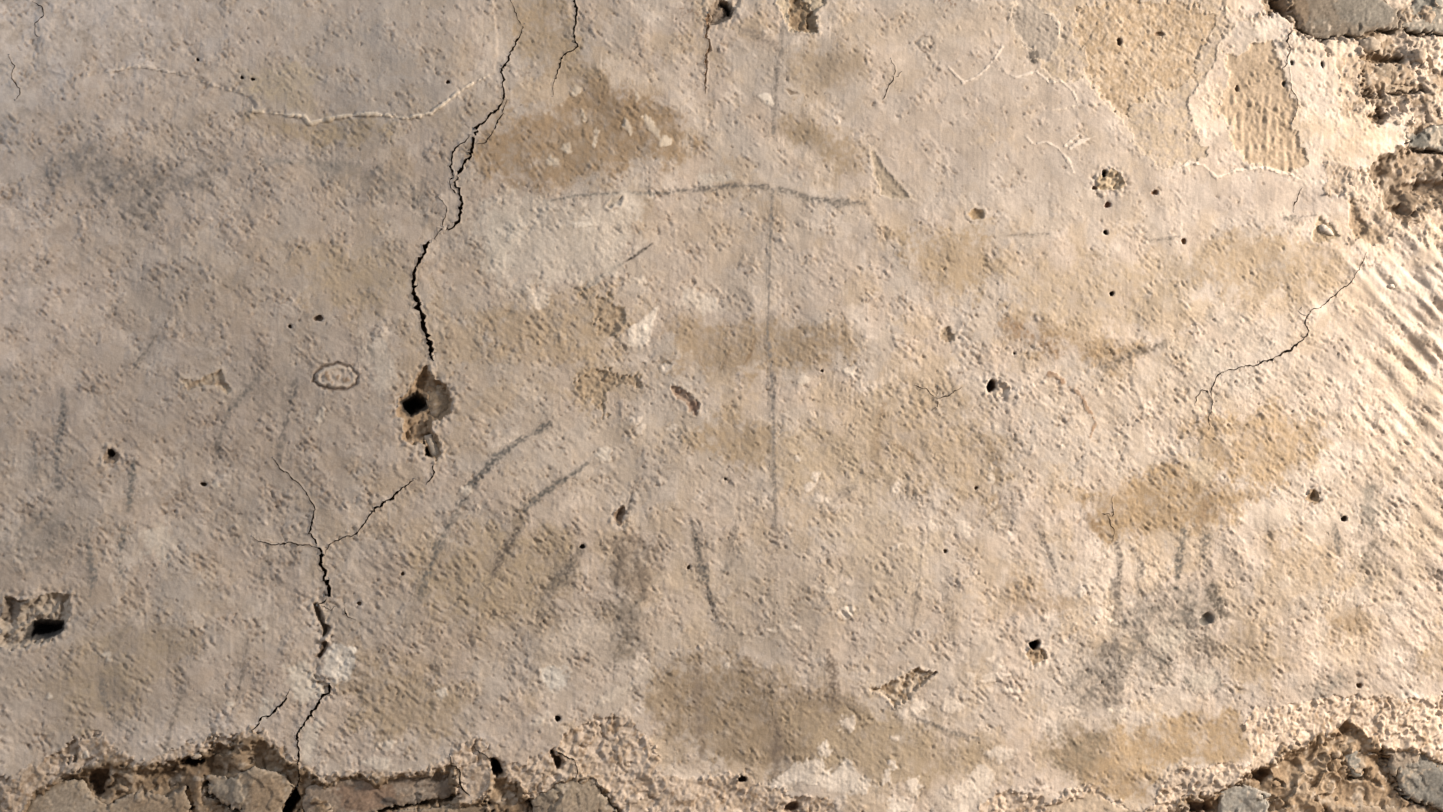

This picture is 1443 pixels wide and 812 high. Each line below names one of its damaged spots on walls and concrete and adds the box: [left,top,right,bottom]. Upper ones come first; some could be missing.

crack [550,0,581,97]
spalling [776,0,827,33]
crack [409,0,525,361]
peeling [1009,0,1443,258]
crack [1193,252,1368,430]
spalling [396,365,453,461]
crack [251,457,437,622]
spalling [0,592,72,652]
spalling [313,603,331,658]
peeling [963,655,1026,705]
crack [249,684,334,788]
spalling [0,667,1443,812]